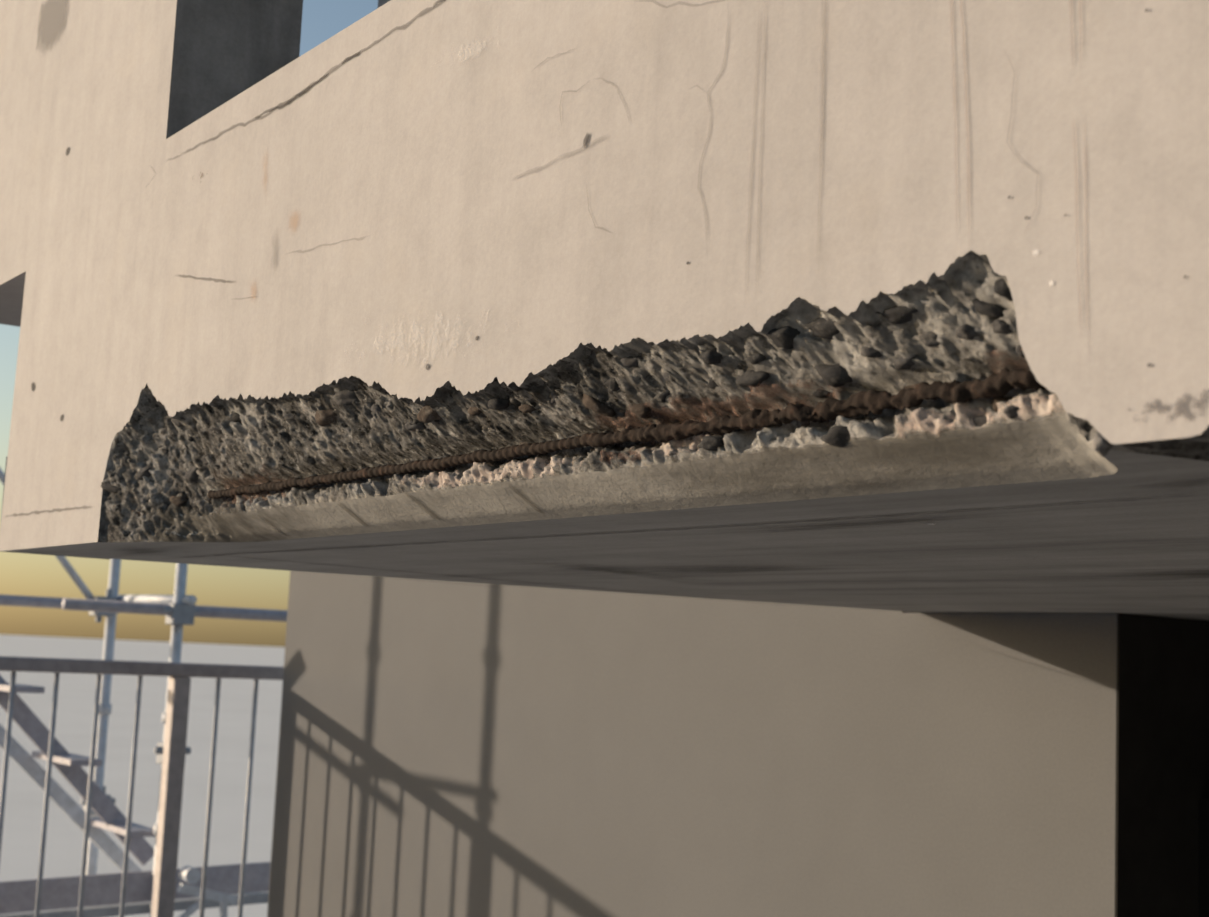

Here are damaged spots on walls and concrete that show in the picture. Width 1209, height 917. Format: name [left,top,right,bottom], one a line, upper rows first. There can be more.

spalling [98,251,1209,542]